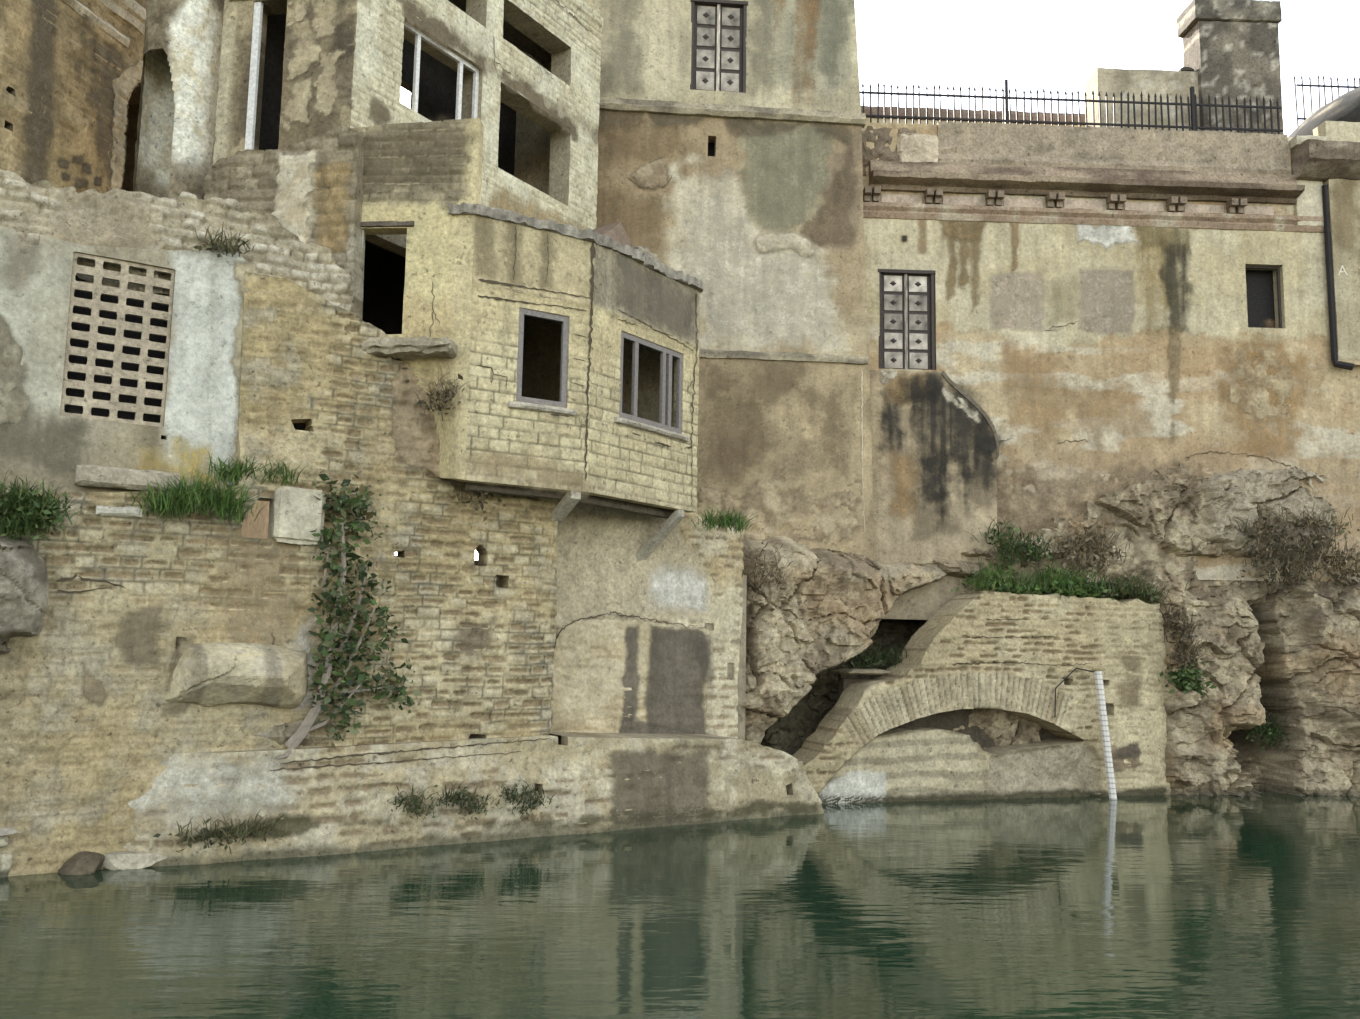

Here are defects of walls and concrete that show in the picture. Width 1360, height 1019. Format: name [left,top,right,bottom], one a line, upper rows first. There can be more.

spalling [0,315,31,425]
leakage [919,219,985,305]
leakage [1137,226,1191,401]
leakage [880,374,1000,538]
leakage [651,569,707,610]
leakage [611,626,713,825]